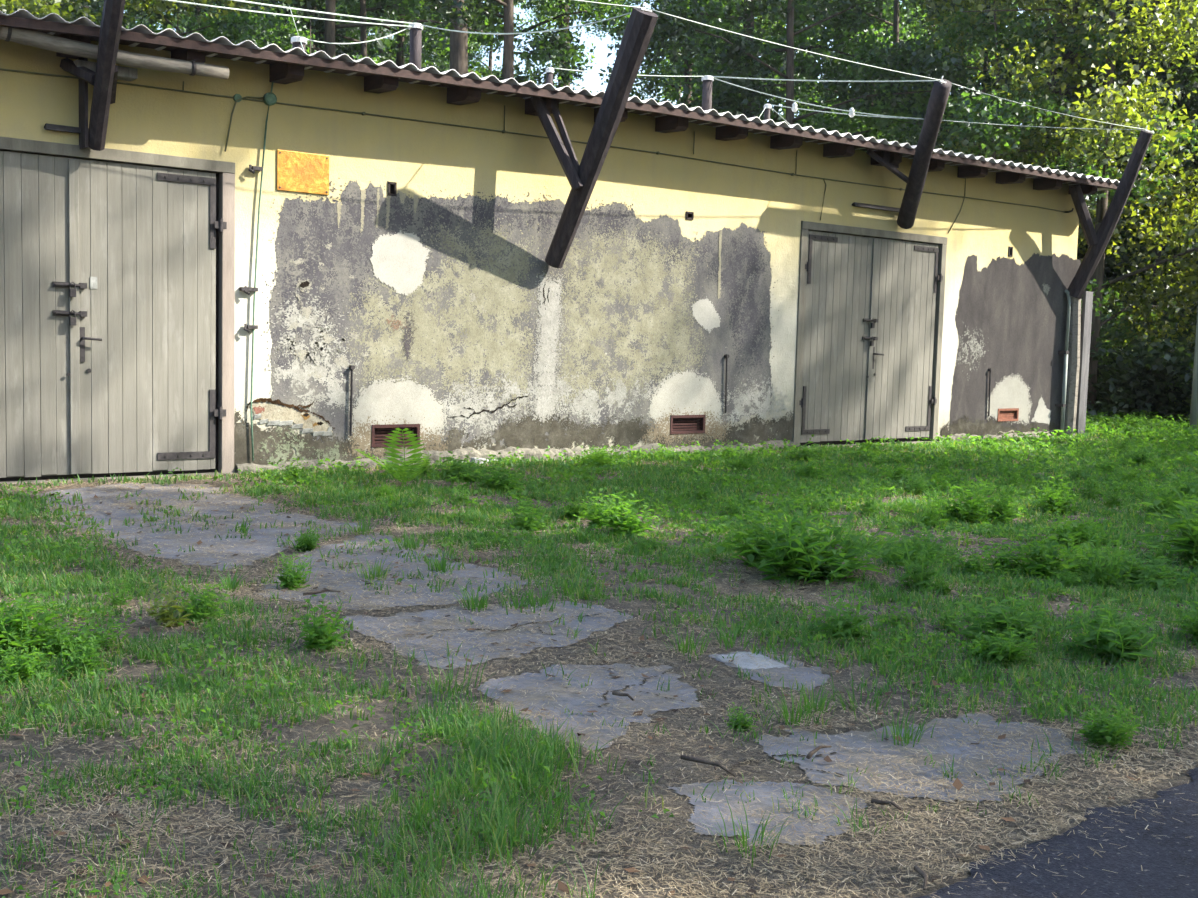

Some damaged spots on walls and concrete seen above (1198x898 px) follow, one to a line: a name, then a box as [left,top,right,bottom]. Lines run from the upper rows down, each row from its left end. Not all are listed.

crack [452,396,528,418]
peeling [252,180,773,448]
peeling [949,253,1081,436]